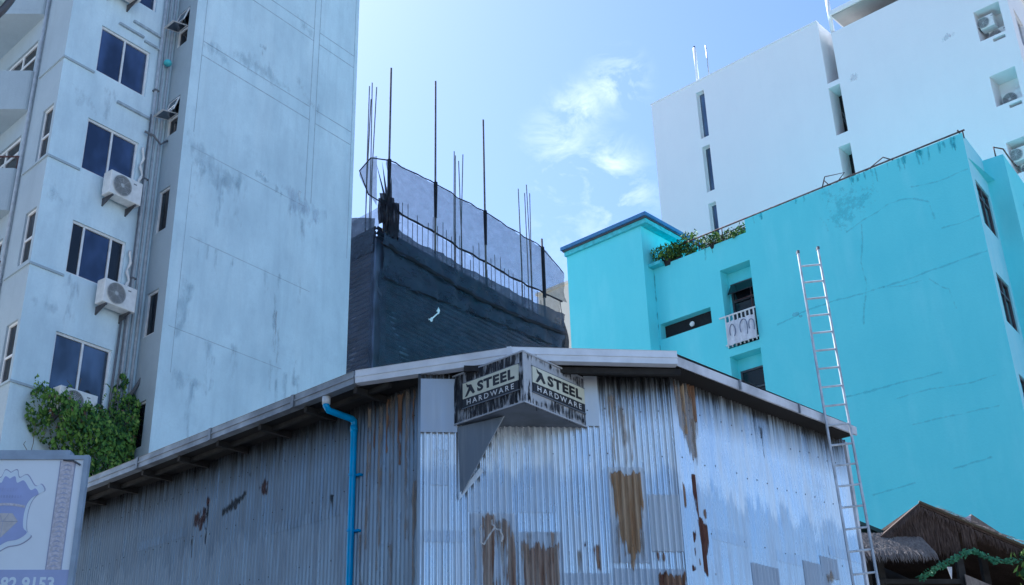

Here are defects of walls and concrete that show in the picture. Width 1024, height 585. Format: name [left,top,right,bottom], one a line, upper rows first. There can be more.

corrosion [673,381,698,458]
corrosion [194,497,210,531]
corrosion [475,513,560,585]
corrosion [608,395,644,570]
corrosion [657,474,709,585]